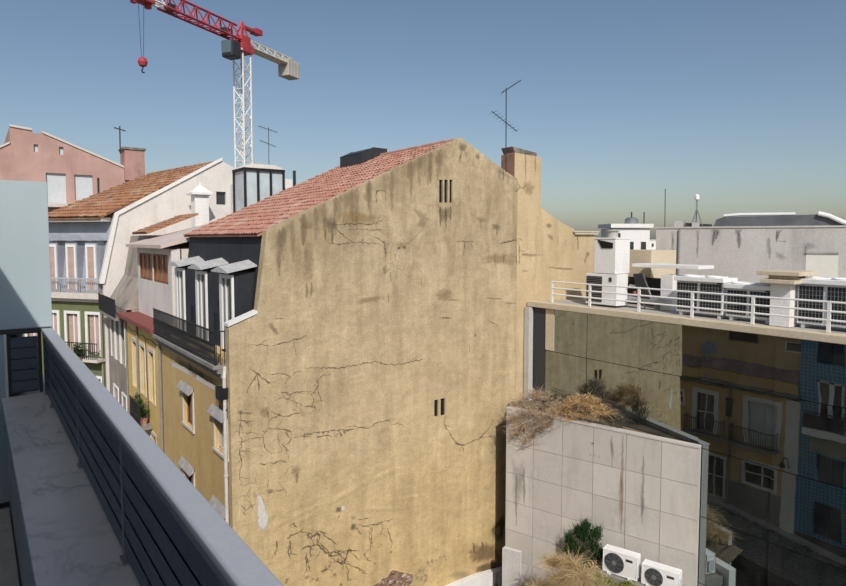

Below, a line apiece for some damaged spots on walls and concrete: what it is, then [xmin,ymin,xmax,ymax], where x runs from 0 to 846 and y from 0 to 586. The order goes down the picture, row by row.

crack [330,221,416,260]
crack [239,337,422,513]
peeling [257,494,269,530]
crack [272,517,393,581]